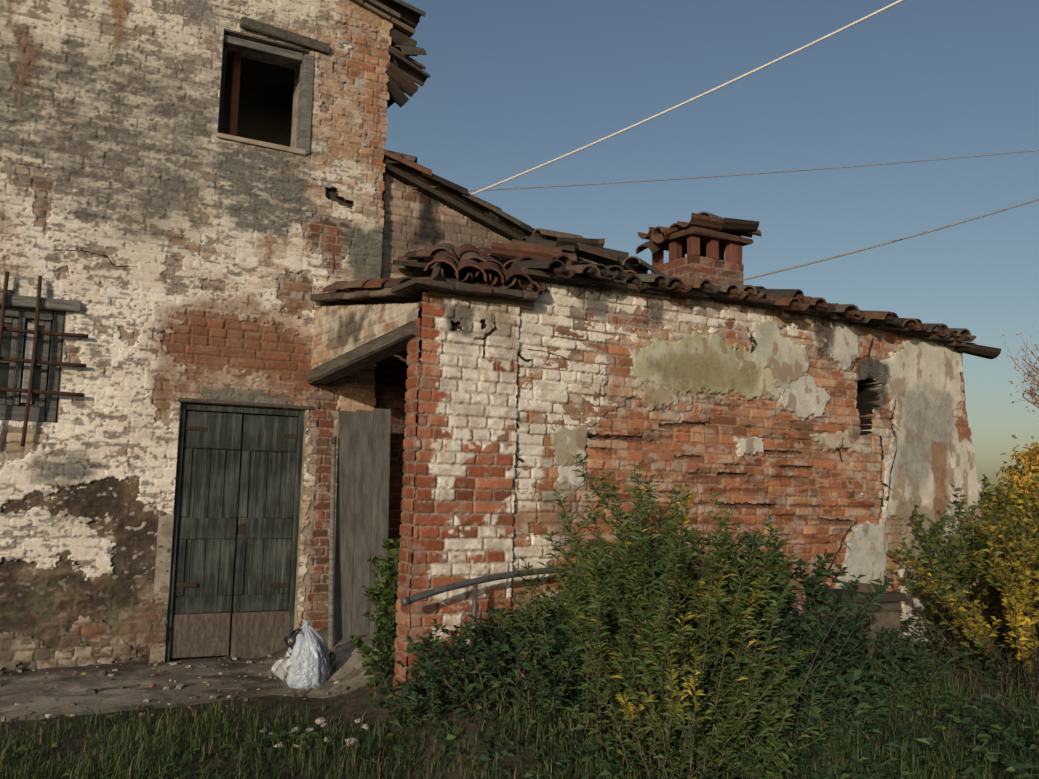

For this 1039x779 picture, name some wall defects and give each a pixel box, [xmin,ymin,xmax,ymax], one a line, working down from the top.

spalling [318,23,390,217]
spalling [0,424,48,462]
flaking render [0,475,171,670]
spalling [160,187,357,631]
crack [475,316,497,356]
spalling [534,305,988,642]
crack [828,400,902,570]